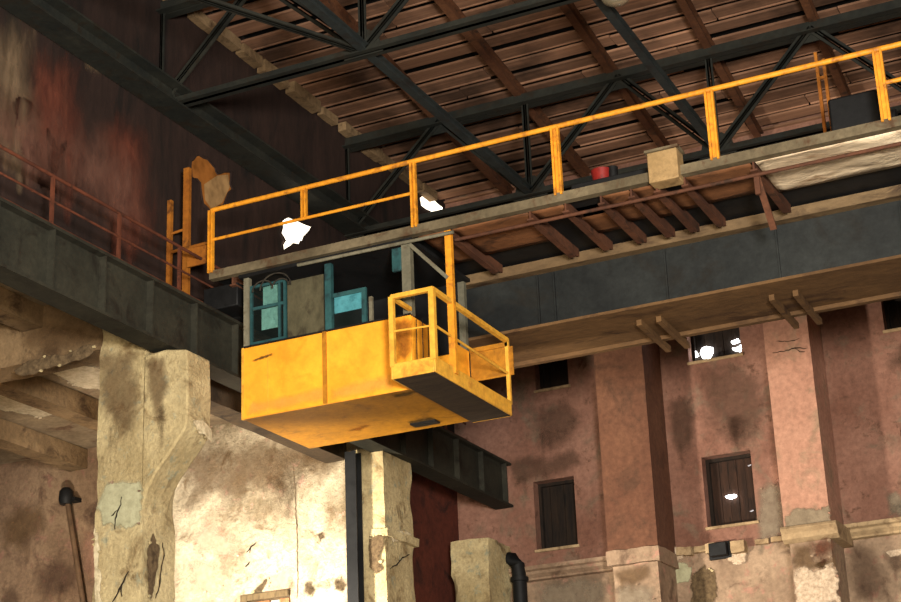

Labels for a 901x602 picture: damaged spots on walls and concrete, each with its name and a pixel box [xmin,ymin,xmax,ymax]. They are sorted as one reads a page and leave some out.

crack [774,338,807,353]
leakage [102,357,134,424]
leakage [149,362,165,411]
crack [112,571,129,602]
spalling [369,530,412,574]
flaking render [794,538,840,602]